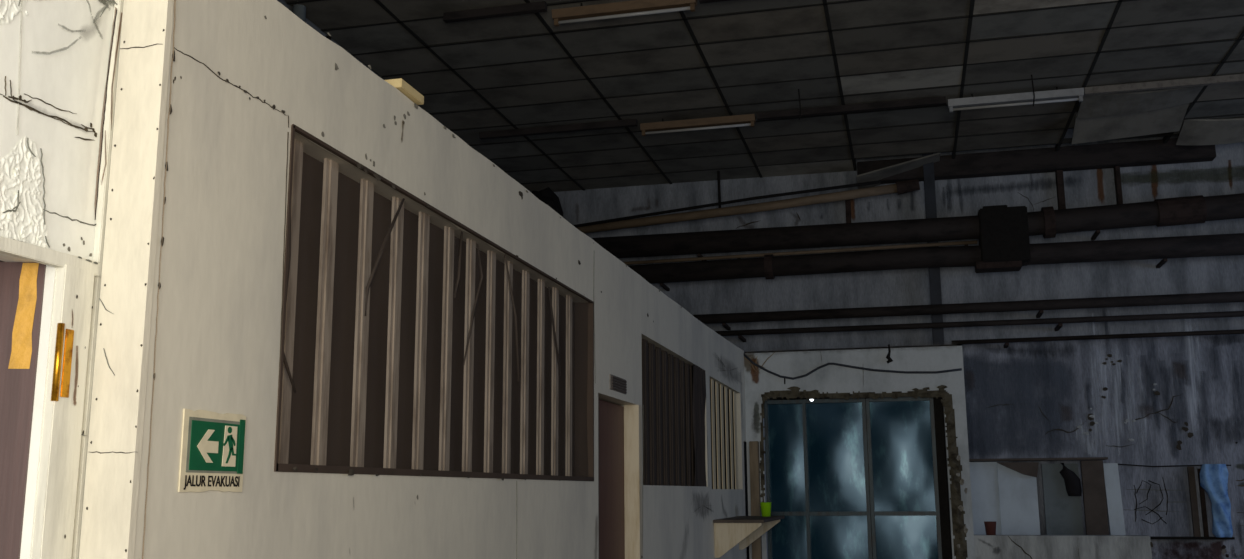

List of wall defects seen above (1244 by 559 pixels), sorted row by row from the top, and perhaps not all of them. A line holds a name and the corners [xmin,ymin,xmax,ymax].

damp [964,358,1068,453]
peeling [1150,541,1236,559]